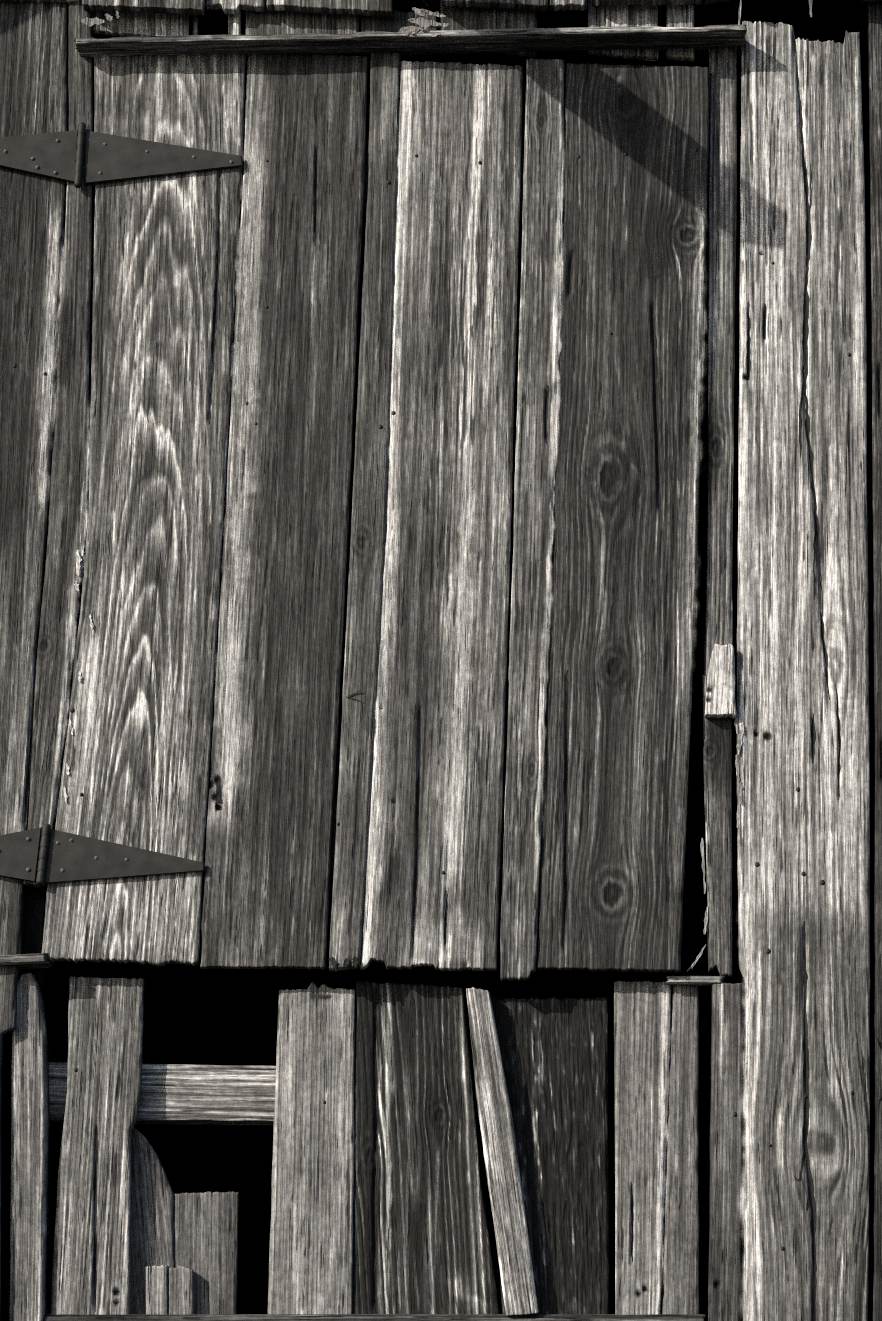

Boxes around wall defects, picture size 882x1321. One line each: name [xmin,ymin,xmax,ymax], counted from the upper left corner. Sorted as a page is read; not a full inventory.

crack [746,302,767,380]
crack [794,39,841,800]